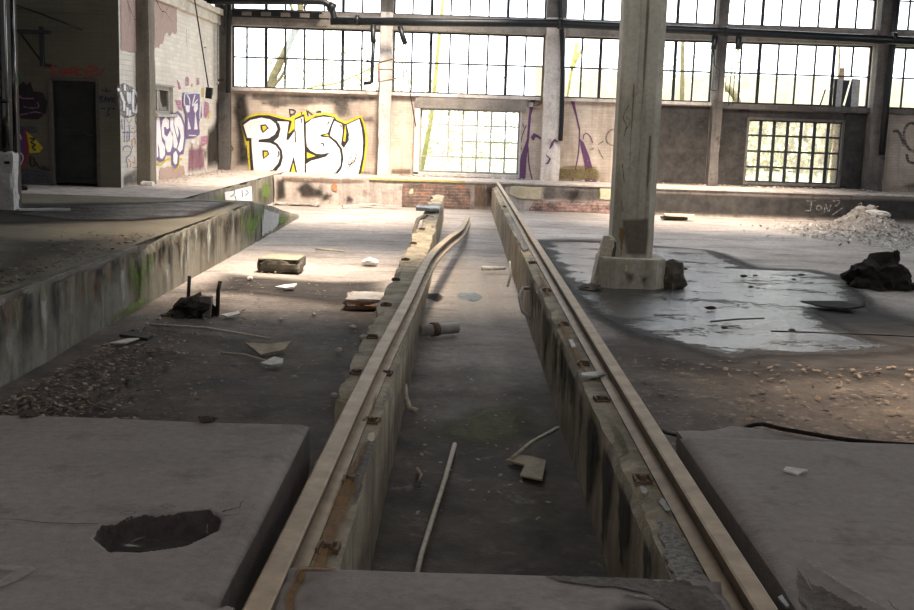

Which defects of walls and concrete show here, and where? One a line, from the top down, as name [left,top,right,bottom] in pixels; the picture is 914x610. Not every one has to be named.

peeling [120,0,136,53]
peeling [154,0,177,50]
damp [0,203,131,224]
damp [98,207,264,316]
damp [626,304,914,375]
hole [93,505,221,553]
corrosion [286,446,365,610]